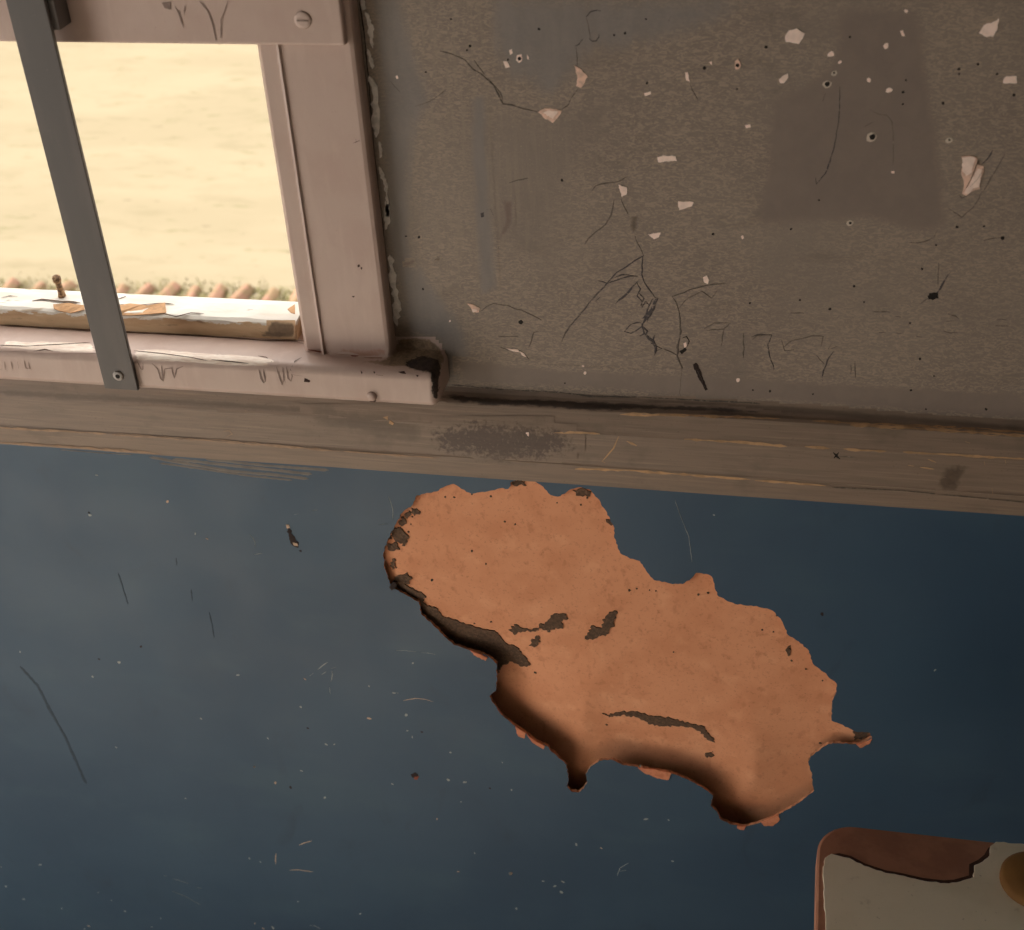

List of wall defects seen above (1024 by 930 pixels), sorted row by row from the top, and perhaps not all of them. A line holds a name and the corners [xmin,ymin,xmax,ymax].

crack [441,51,536,112]
peeling [961,155,984,196]
peeling [384,480,872,830]